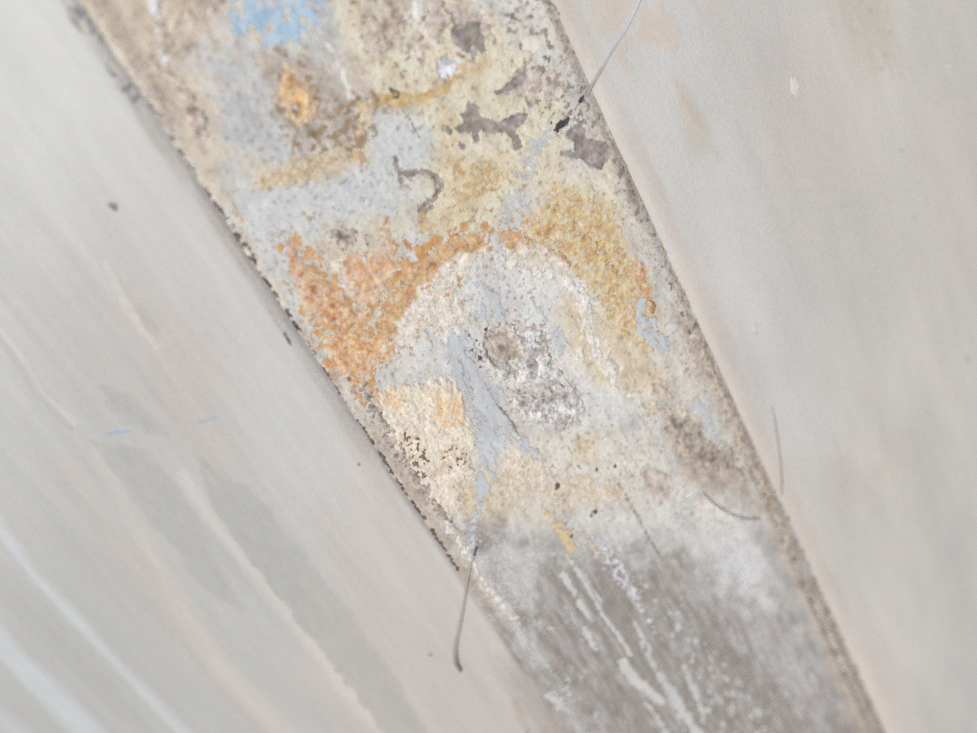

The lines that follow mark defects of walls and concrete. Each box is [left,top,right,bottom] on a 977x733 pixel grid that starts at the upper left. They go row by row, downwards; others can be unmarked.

spalling [59,0,146,110]
peeling [349,0,650,244]
rust [372,325,453,392]
peeling [627,296,670,356]
rust [329,373,469,583]
peeling [443,325,548,560]
peeling [603,449,689,516]
rust [762,472,775,500]
damp [585,532,665,641]